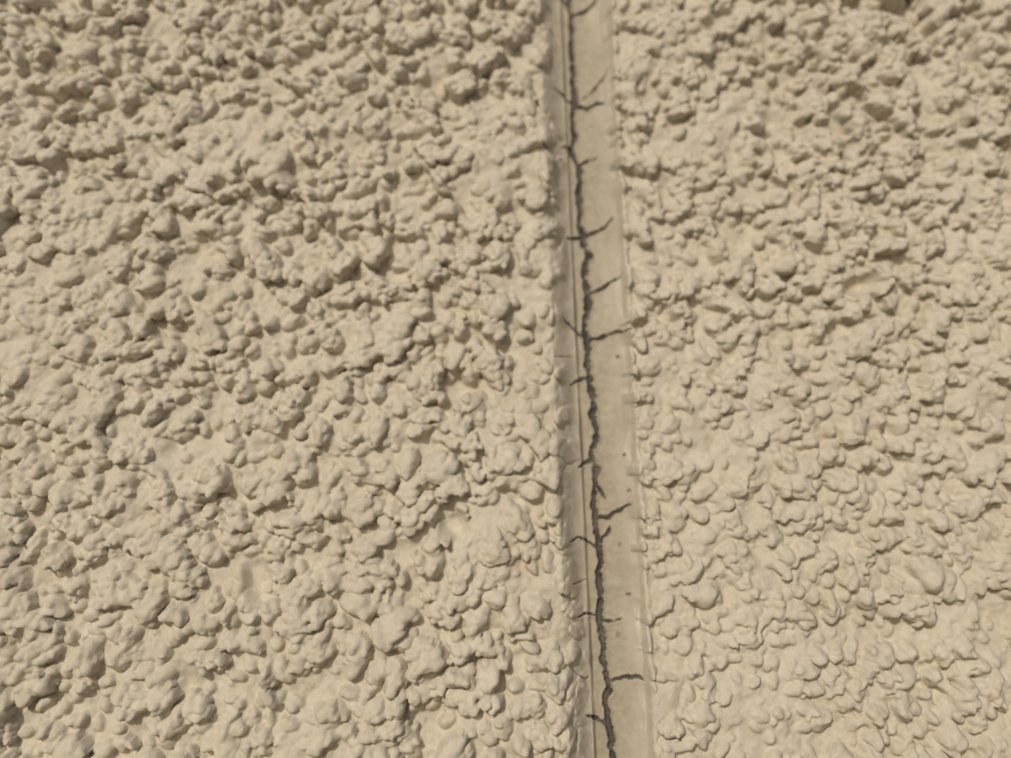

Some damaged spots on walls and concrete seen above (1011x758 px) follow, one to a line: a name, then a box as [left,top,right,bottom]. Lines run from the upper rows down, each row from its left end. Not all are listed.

crack [543,0,644,758]